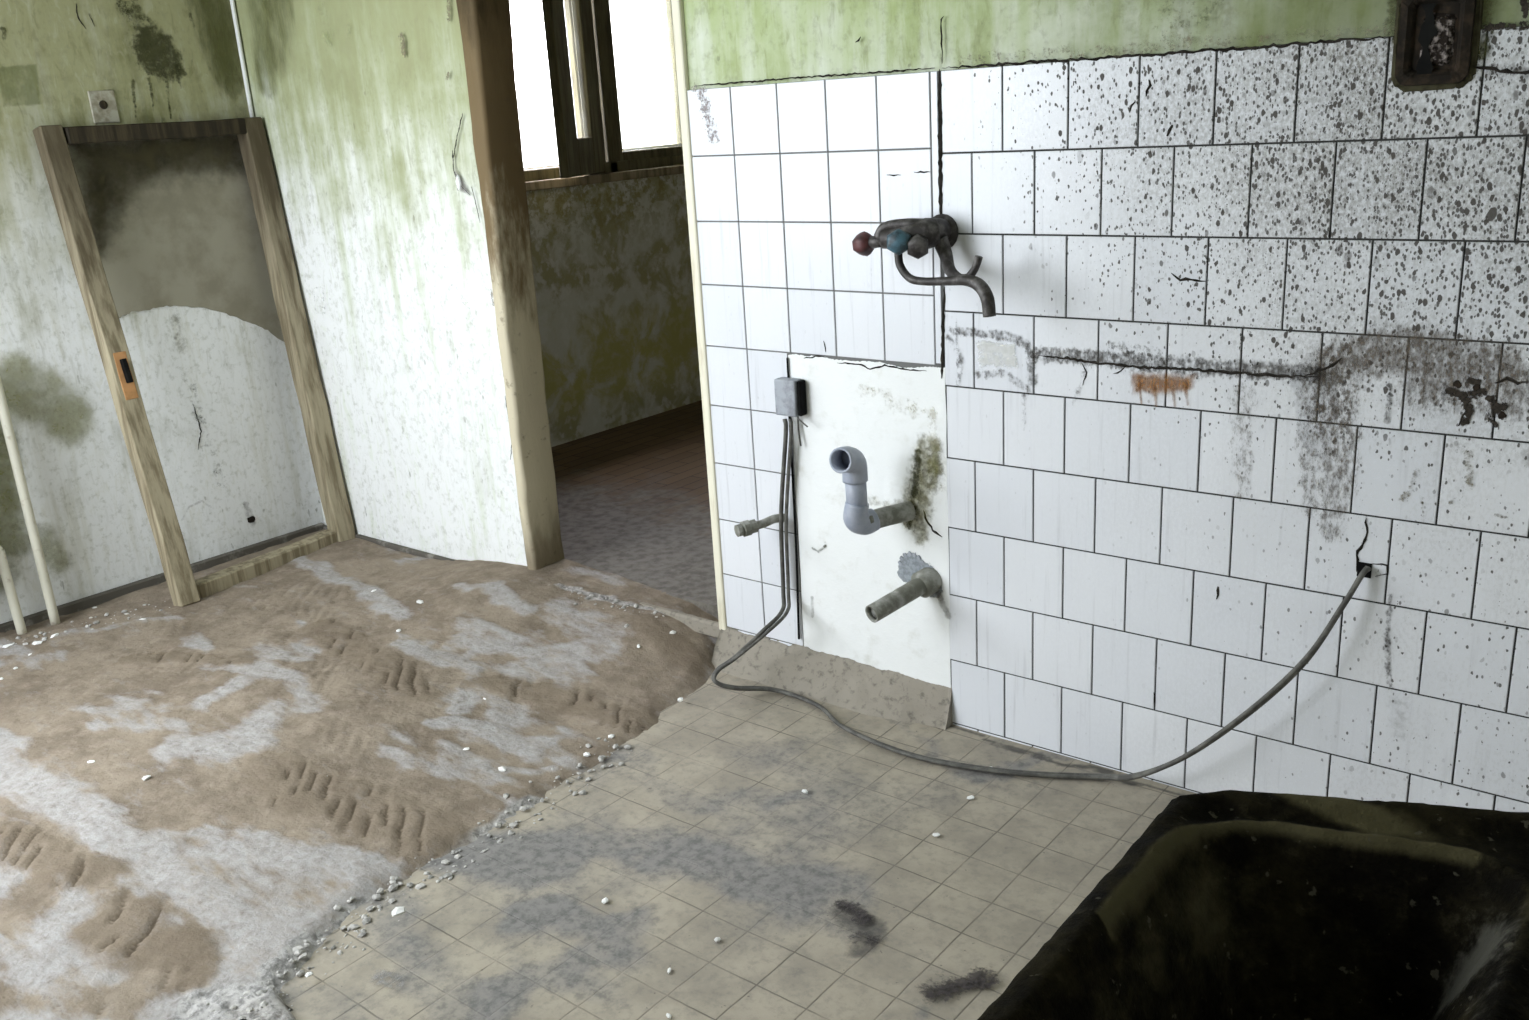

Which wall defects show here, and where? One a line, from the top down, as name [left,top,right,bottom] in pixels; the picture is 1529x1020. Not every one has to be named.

leakage [118,4,186,119]
leakage [190,0,283,92]
leakage [1,361,86,436]
rust [1133,374,1192,400]
crack [1031,348,1342,383]
leakage [1298,326,1529,539]
leakage [0,429,26,555]
spalling [788,341,951,688]
leakage [907,449,921,529]